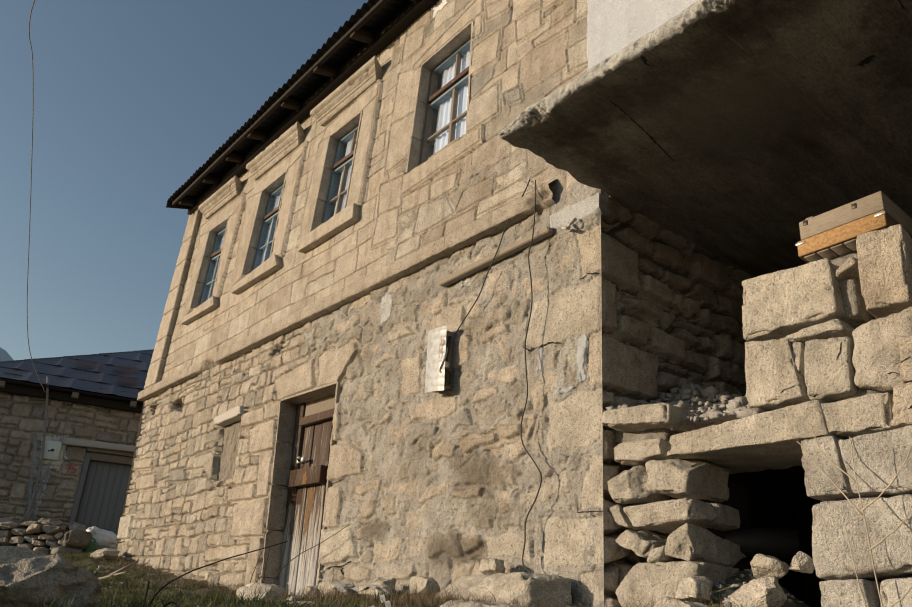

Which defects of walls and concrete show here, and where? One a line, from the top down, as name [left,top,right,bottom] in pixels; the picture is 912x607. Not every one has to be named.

crack [606,98,675,162]